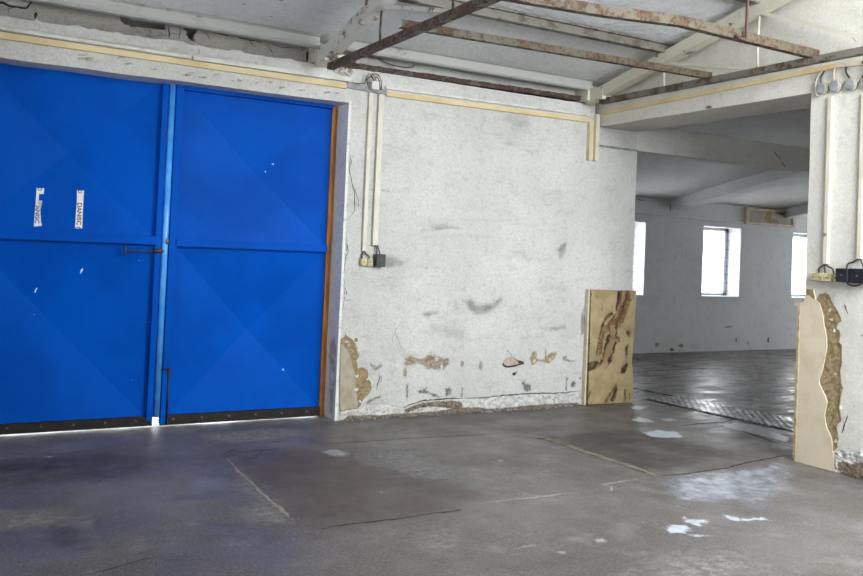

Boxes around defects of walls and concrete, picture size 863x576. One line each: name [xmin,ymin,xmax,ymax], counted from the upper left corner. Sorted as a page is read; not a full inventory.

crack [0,0,32,11]
spalling [339,310,582,421]
peeling [793,289,863,479]